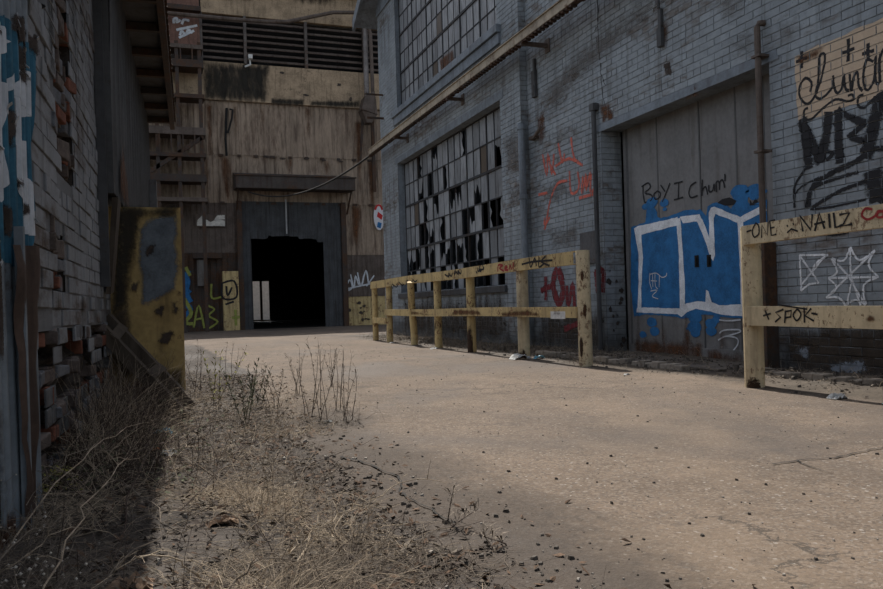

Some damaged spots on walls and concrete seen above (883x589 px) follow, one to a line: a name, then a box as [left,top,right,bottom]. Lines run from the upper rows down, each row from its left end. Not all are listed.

peeling [0,12,40,85]
spalling [51,0,77,186]
damp [204,63,358,107]
peeling [0,102,19,150]
peeling [131,216,178,316]
corrosion [636,330,738,361]
crack [772,447,883,473]